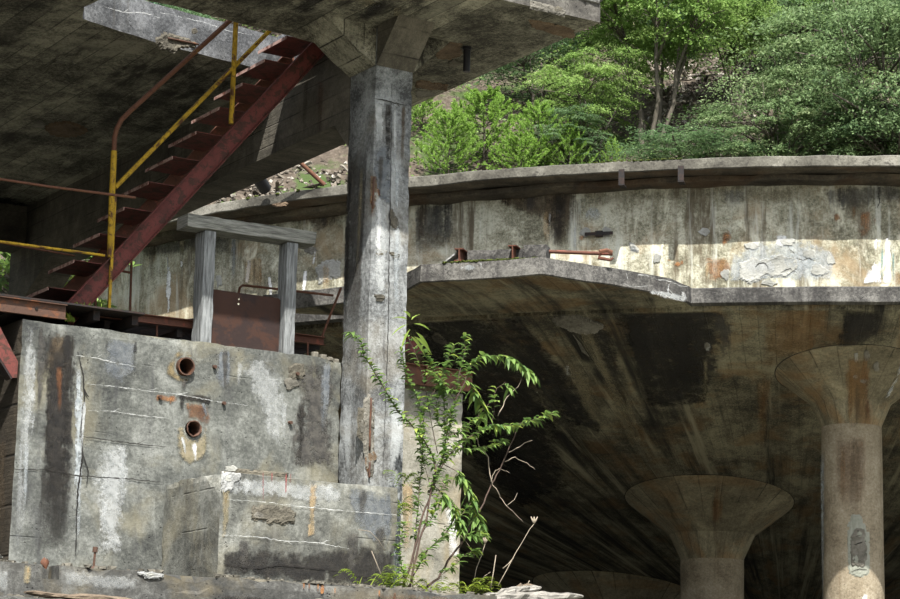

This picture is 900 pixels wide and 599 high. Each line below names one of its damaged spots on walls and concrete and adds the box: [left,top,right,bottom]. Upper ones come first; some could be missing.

spalling [155,28,199,54]
flaking render [720,238,835,286]
efflorescence [864,238,894,283]
water stain [37,330,86,514]
crack [75,352,89,556]
spalling [850,528,867,568]